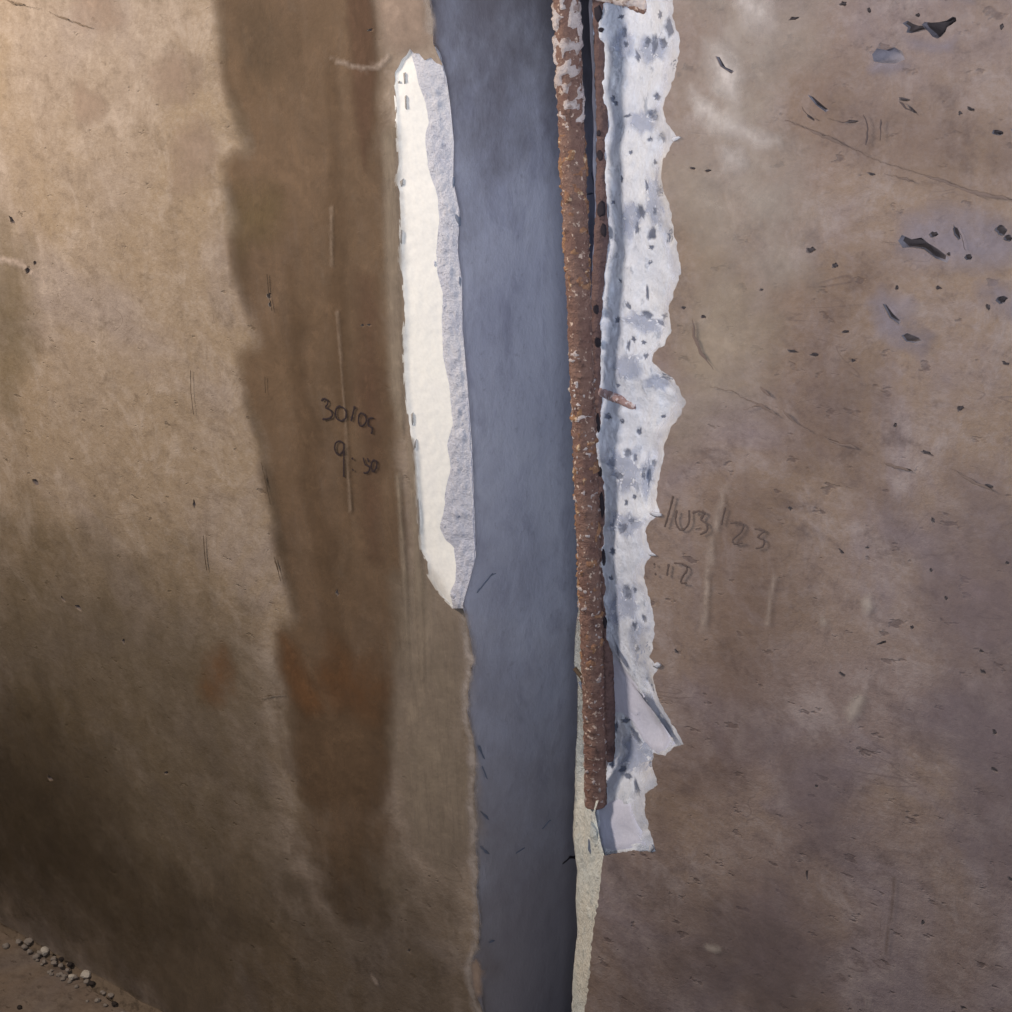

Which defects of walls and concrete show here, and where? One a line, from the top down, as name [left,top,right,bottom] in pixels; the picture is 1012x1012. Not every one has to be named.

damp [220,0,470,911]
peeling [394,47,482,1012]
corrosion [594,5,604,32]
corrosion [597,200,607,237]
spalling [572,0,686,1012]
crack [785,108,1010,200]